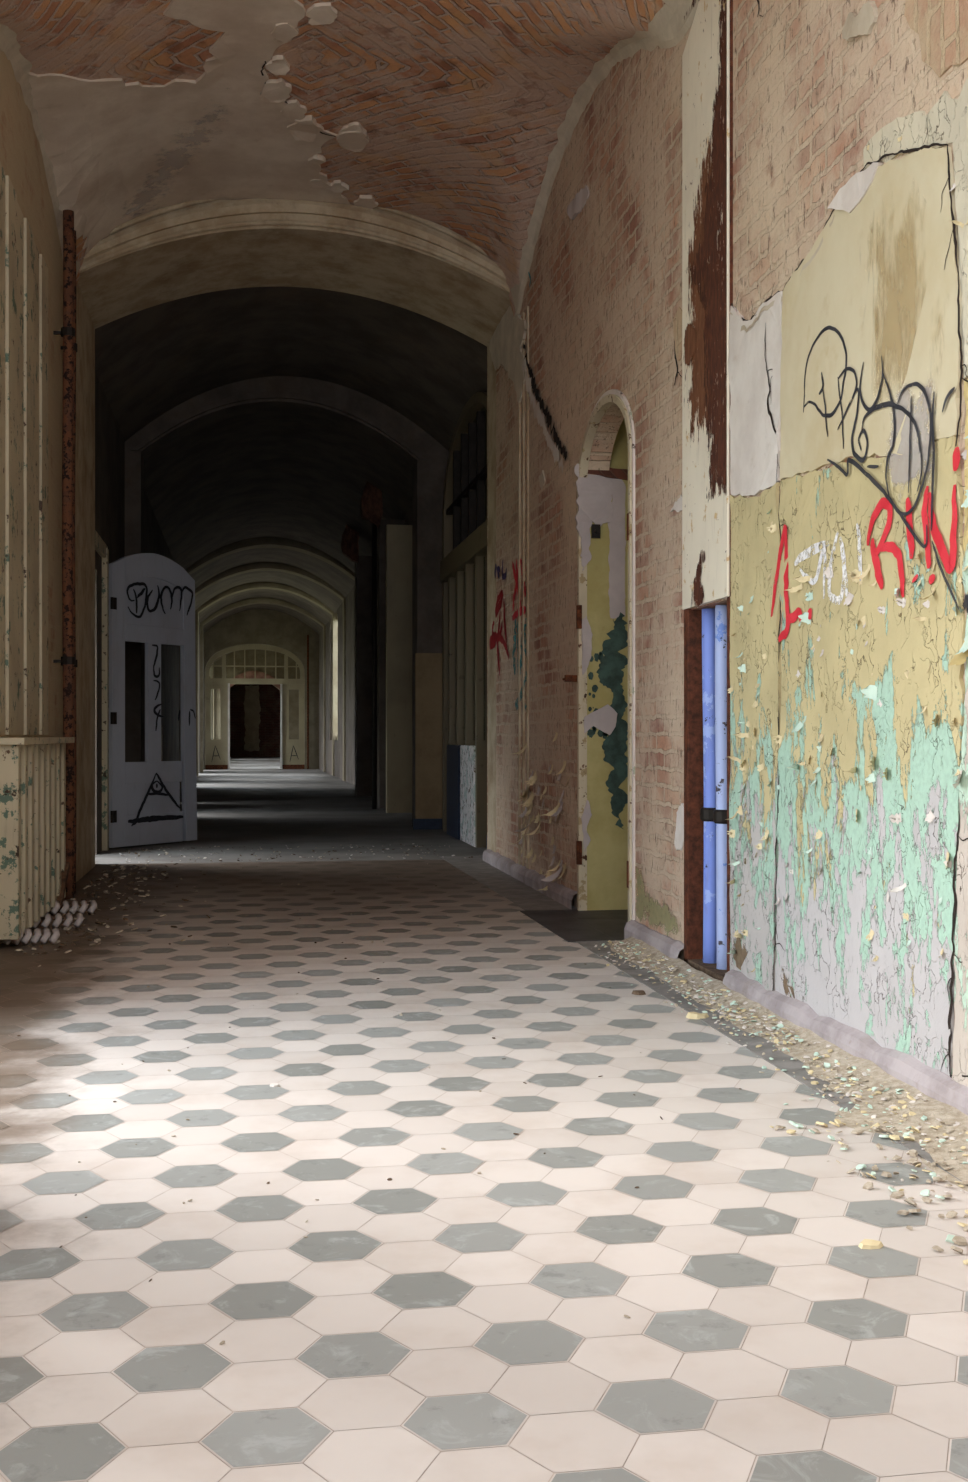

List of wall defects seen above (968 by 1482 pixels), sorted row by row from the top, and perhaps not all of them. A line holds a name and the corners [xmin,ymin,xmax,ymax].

peeling [29,0,378,255]
peeling [726,0,968,1087]